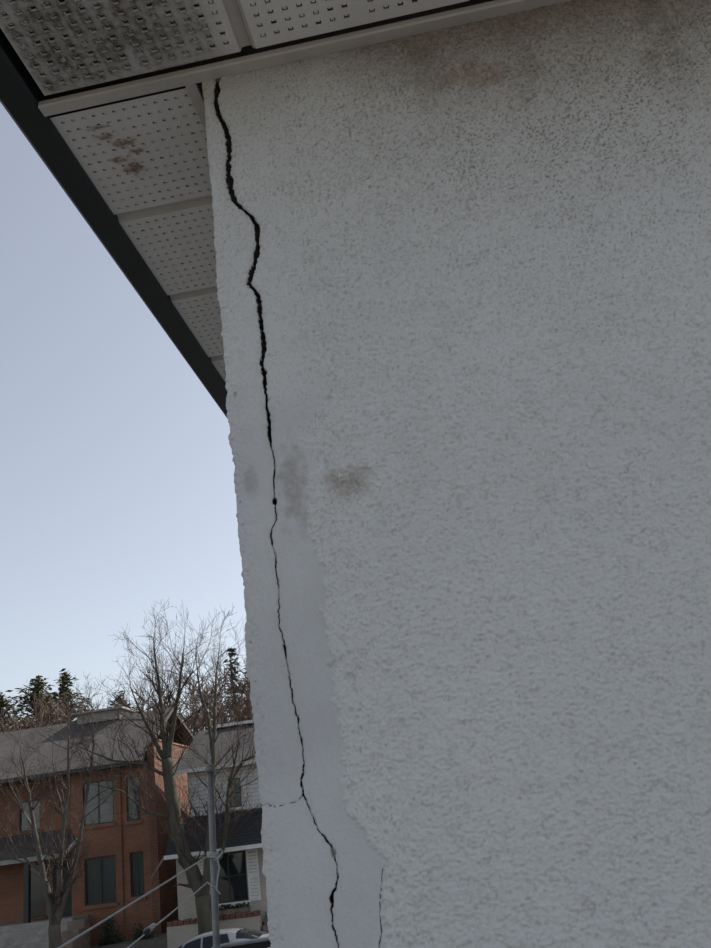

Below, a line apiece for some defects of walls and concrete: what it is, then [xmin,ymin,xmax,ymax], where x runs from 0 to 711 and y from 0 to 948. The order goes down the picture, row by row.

leakage [0,0,214,90]
rust [95,126,143,172]
crack [214,81,339,948]